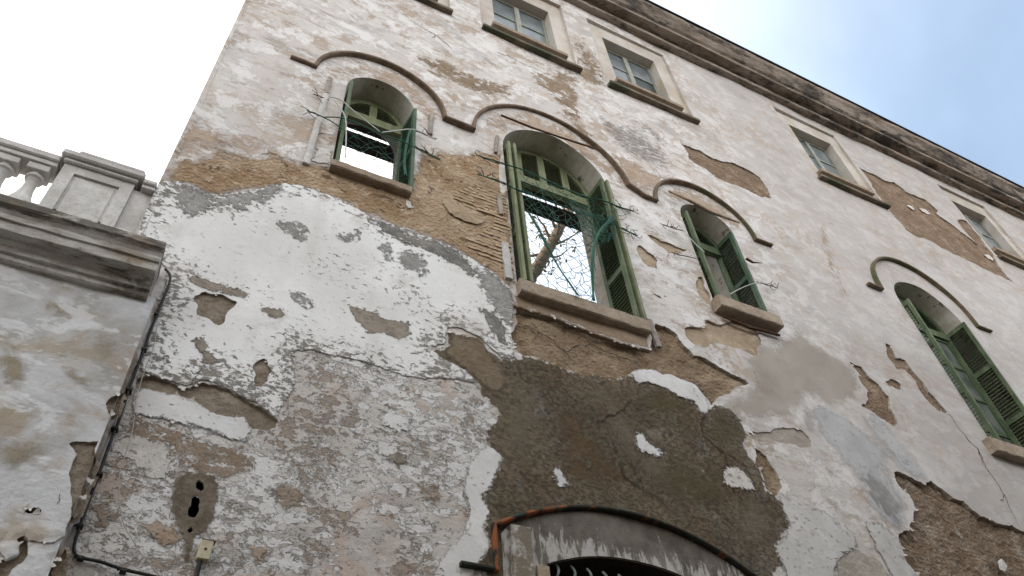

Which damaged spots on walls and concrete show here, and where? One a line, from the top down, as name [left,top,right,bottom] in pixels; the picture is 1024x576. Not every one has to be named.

flaking render [859,167,1012,282]
peeling [106,144,949,547]
flaking render [0,536,28,576]
flaking render [18,504,41,514]
flaking render [49,547,72,576]
flaking render [69,441,126,527]
flaking render [862,471,1024,576]